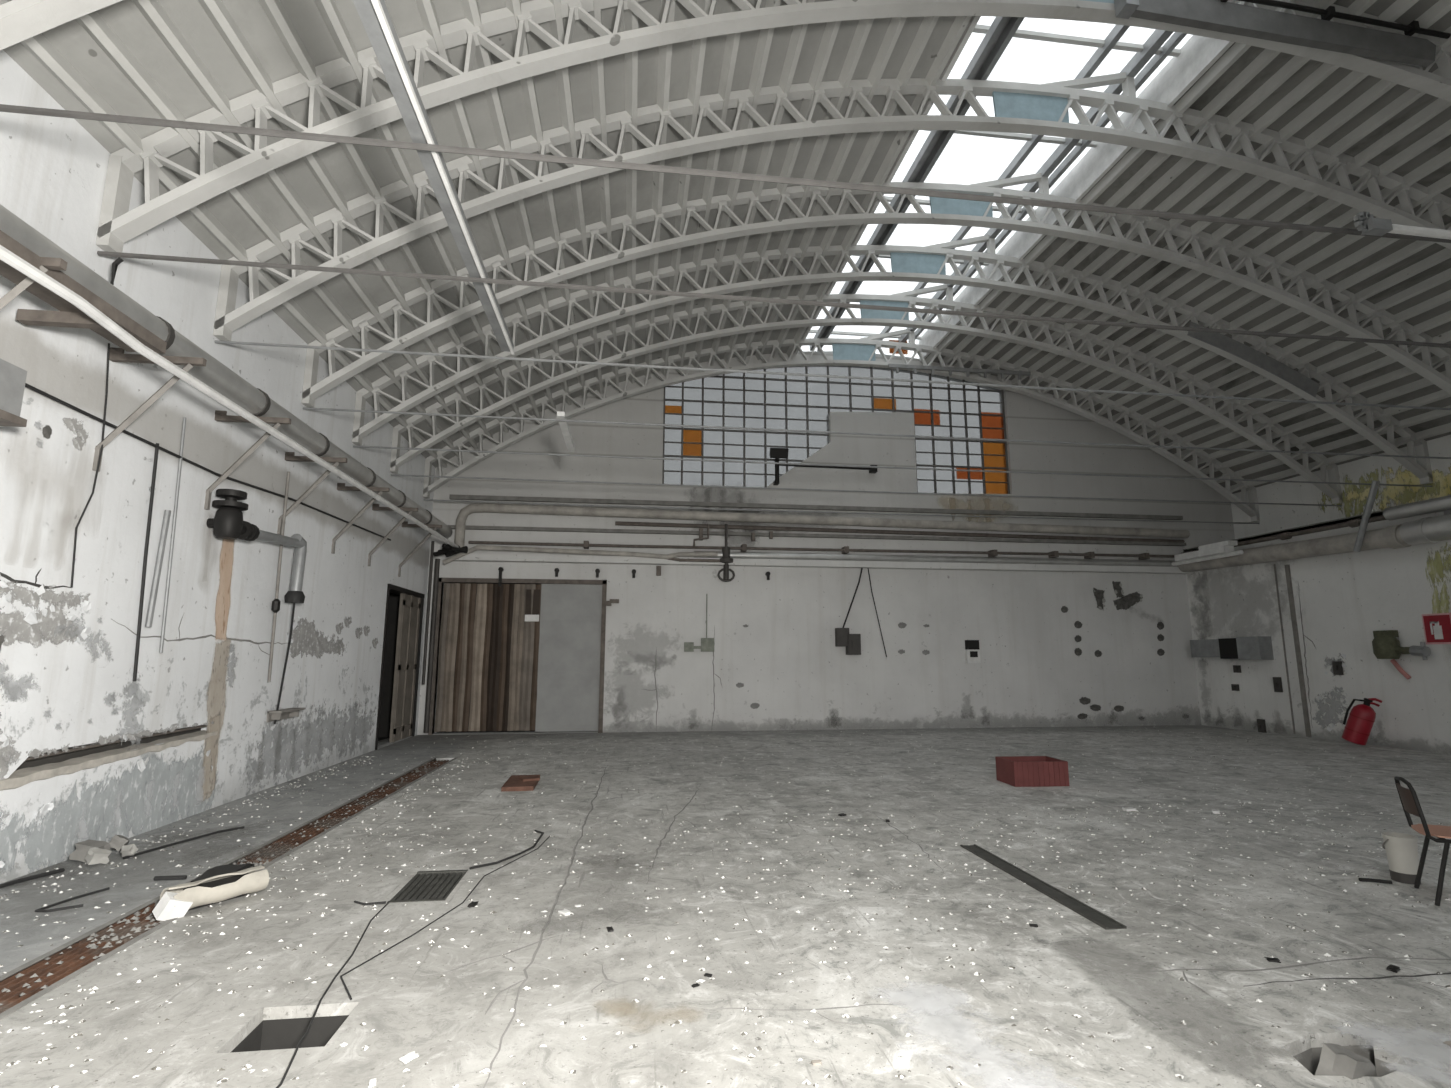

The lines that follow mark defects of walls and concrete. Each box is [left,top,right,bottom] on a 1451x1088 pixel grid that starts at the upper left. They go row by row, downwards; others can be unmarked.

peeling [0,575,91,649]
corrosion [200,539,234,800]
spalling [290,616,378,658]
peeling [0,746,217,872]
crack [647,784,701,883]
crack [421,765,627,1088]
crack [1075,953,1451,995]